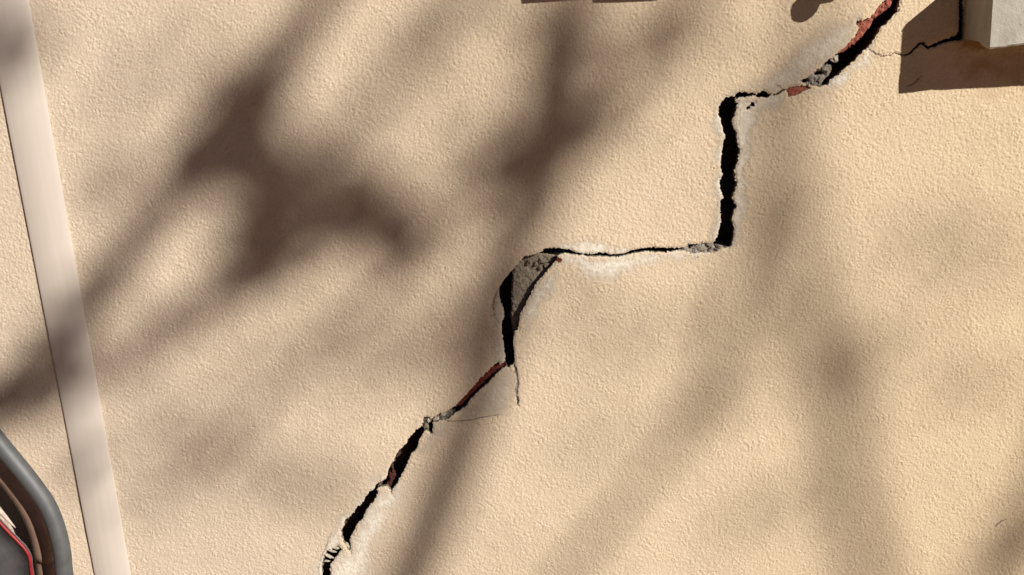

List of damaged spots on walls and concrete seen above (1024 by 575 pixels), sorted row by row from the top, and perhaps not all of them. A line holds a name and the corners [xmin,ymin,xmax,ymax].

flaking render [709,0,892,246]
flaking render [492,240,707,364]
crack [318,0,964,575]
flaking render [315,468,401,575]